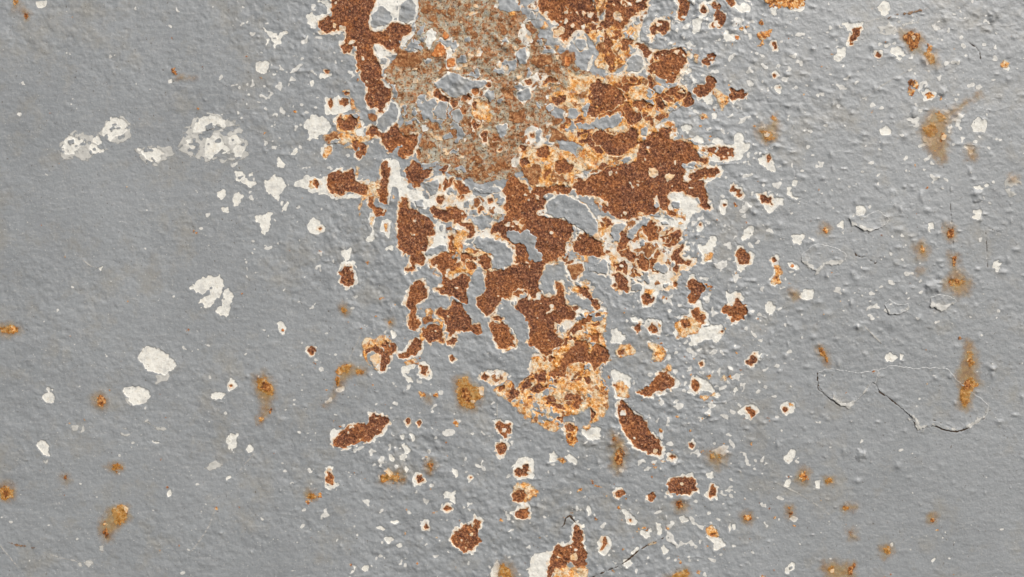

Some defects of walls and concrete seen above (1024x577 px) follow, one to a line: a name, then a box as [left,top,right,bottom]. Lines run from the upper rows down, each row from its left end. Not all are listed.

corrosion [736,0,805,46]
corrosion [903,31,935,64]
corrosion [908,79,947,155]
peeling [59,0,800,520]
corrosion [455,376,484,409]
corrosion [958,336,979,408]
corrosion [549,425,625,466]
peeling [420,491,456,531]
peeling [449,513,485,555]
peeling [526,506,612,577]
peeling [612,487,669,554]
peeling [706,523,736,550]